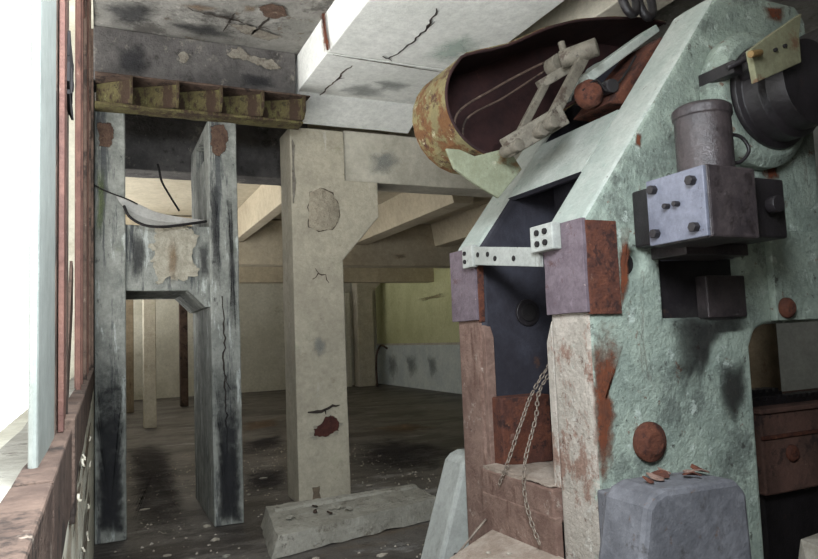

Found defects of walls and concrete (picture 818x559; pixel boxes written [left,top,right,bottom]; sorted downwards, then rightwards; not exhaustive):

crack [188,7,270,33]
spalling [227,47,281,70]
rust [321,13,330,50]
crack [320,8,438,95]
peeling [148,226,200,285]
crack [221,296,231,424]
crack [308,404,340,414]
spalling [309,415,344,439]
leakage [94,386,121,528]
leakage [218,412,239,518]